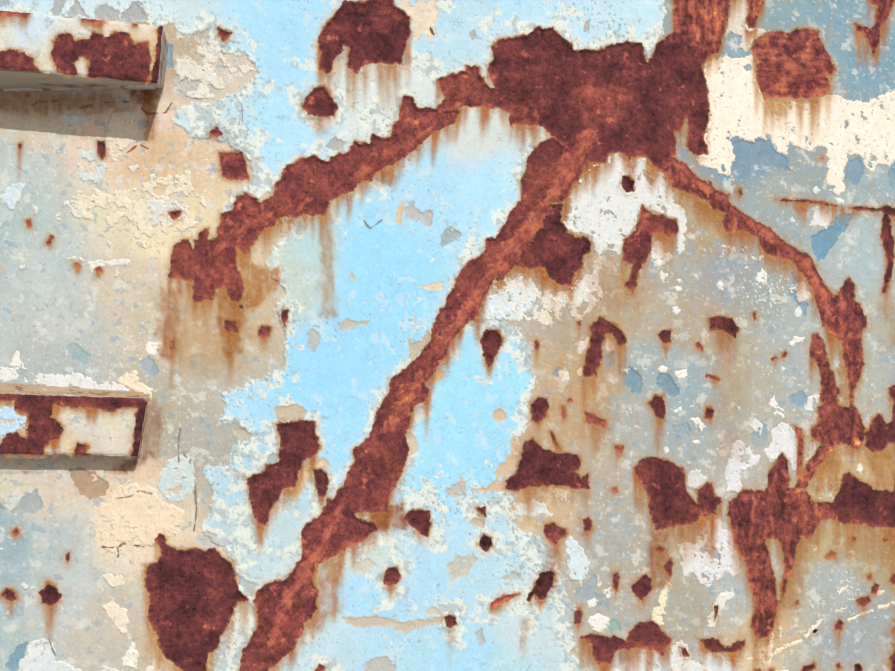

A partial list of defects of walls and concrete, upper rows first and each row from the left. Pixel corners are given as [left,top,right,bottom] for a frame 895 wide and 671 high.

rust [51,18,163,139]
peeling [56,106,206,248]
peeling [695,0,895,262]
peeling [66,256,130,277]
rust [775,198,895,295]
rust [168,0,867,671]
rust [0,394,149,465]
peeling [5,638,82,671]
peeling [99,600,161,671]
peeling [69,454,196,557]
rust [143,533,248,671]
rust [727,426,895,659]